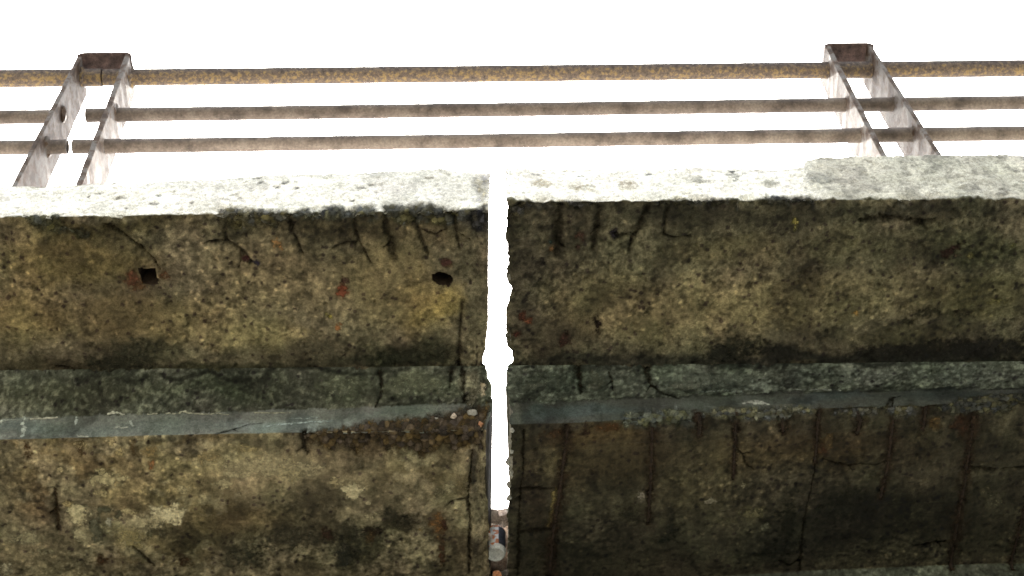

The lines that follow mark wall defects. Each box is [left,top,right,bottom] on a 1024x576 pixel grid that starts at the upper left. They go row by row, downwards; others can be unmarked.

crack [202,210,252,265]
crack [289,220,303,252]
crack [335,214,463,260]
crack [553,202,565,256]
crack [590,203,691,251]
leakage [83,337,164,372]
leakage [705,329,794,361]
leakage [845,334,1024,361]
crack [643,366,677,399]
spalling [197,383,491,519]